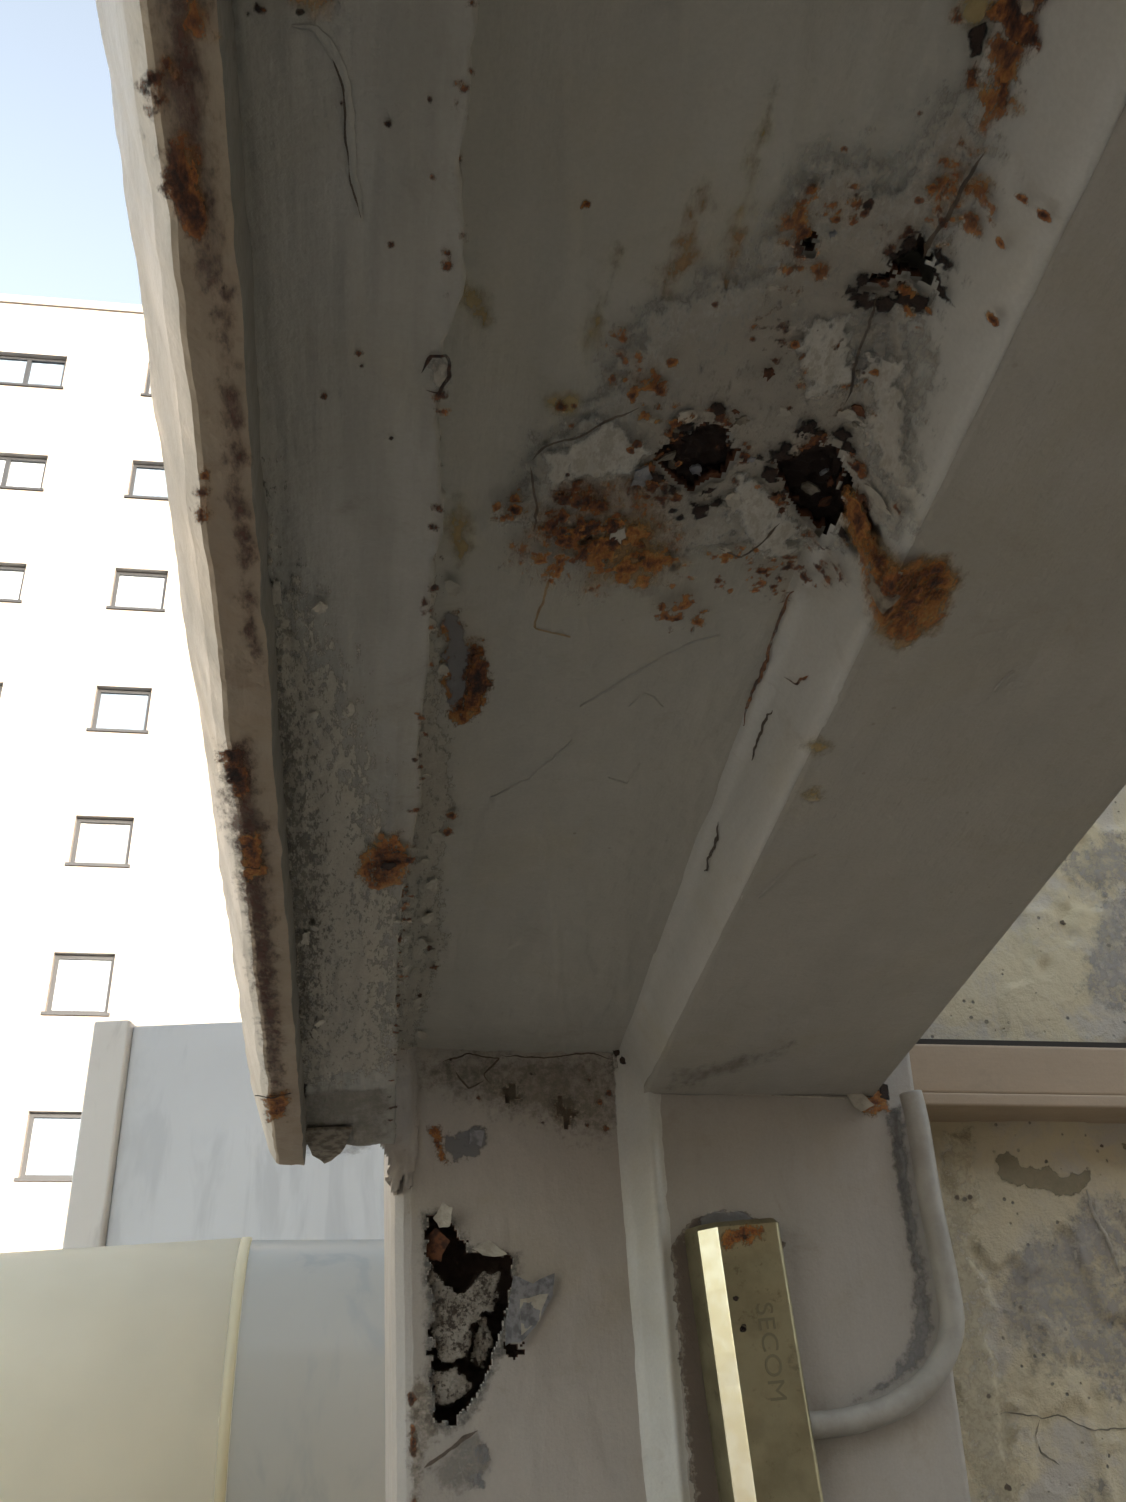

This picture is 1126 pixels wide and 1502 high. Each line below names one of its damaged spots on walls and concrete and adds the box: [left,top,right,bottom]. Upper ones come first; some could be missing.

corrosion [136,0,237,366]
crack [332,59,361,217]
corrosion [951,0,1048,135]
spalling [1015,193,1052,223]
spalling [491,65,1007,638]
corrosion [842,486,959,650]
corrosion [422,584,494,727]
crack [743,591,808,760]
crack [704,825,719,871]
corrosion [215,739,291,1123]
water stain [996,1152,1091,1196]
crack [960,1411,1126,1465]